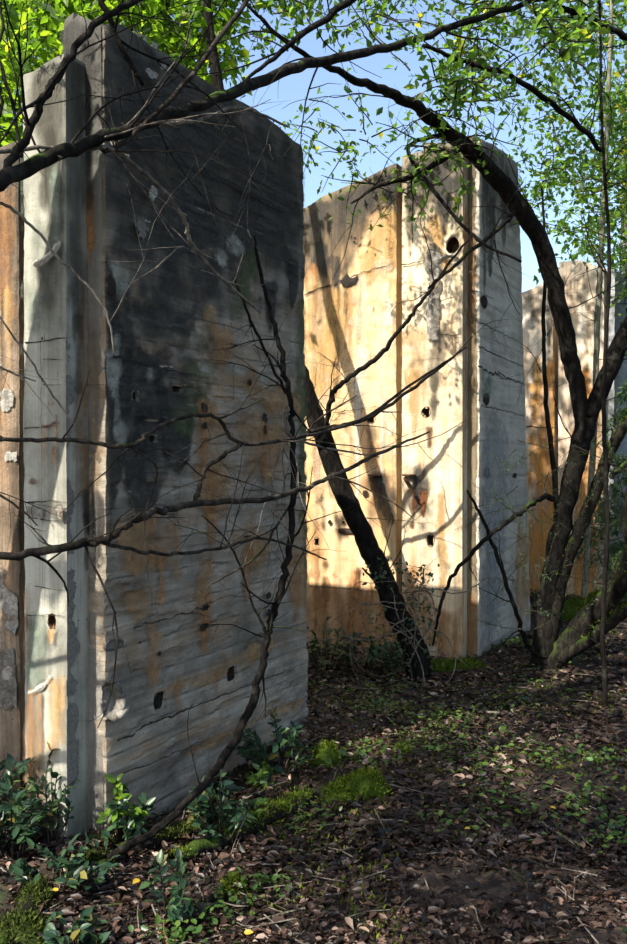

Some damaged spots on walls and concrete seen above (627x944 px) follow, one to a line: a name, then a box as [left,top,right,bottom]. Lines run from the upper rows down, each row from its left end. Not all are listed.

water stain [31,23,93,152]
water stain [39,151,96,338]
corrosion [361,211,395,277]
water stain [83,41,463,567]
corrosion [311,289,350,399]
corrosion [196,399,227,569]
spalling [0,565,18,636]
corrosion [118,522,165,601]
corrosion [287,546,394,651]
spalling [0,648,18,711]
crack [117,662,308,741]